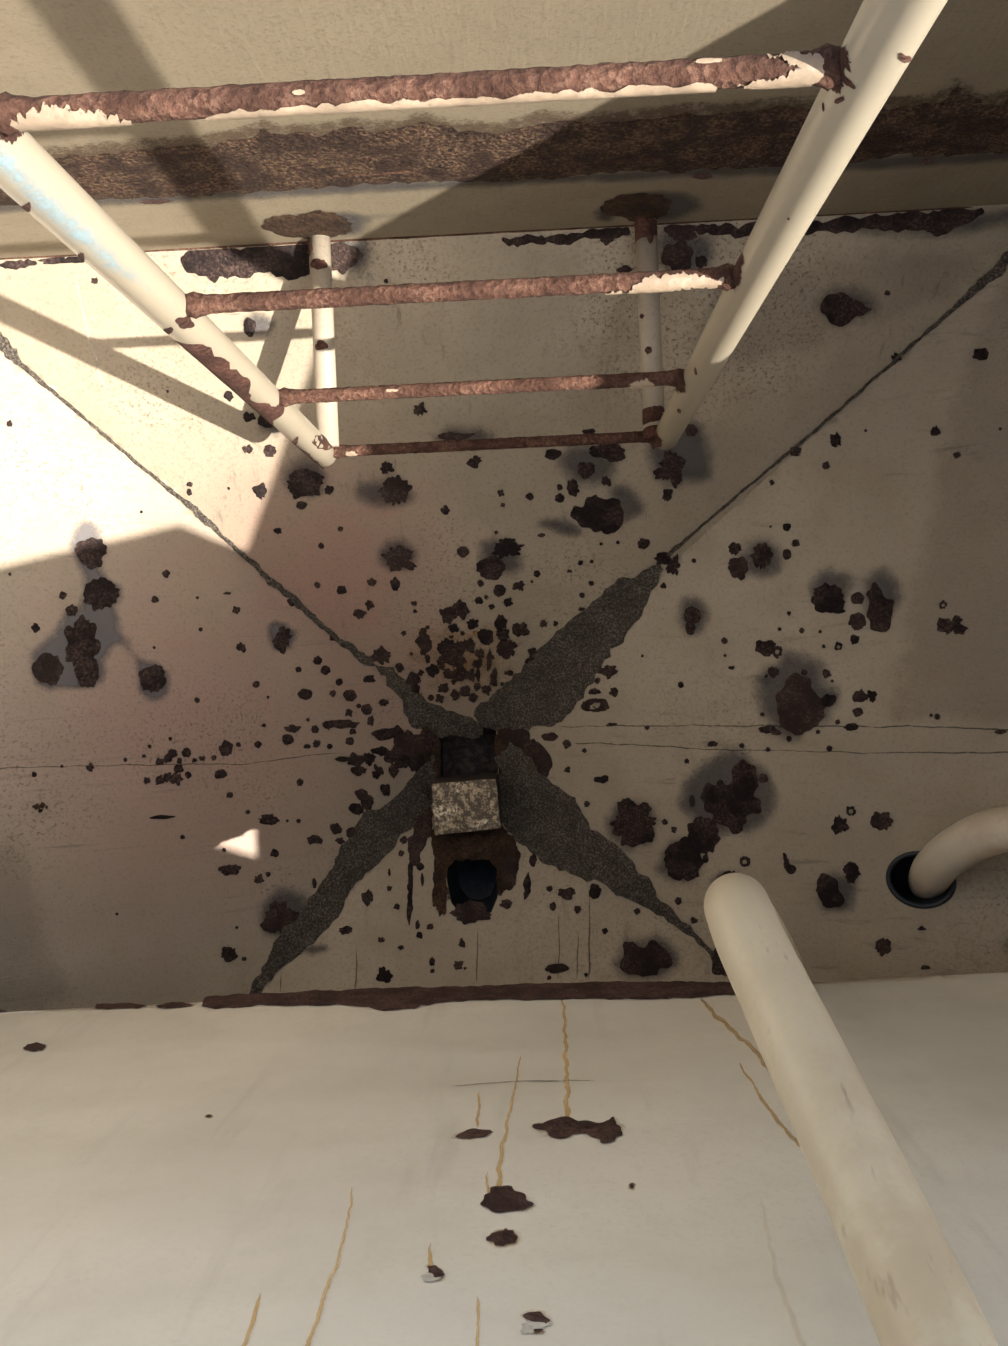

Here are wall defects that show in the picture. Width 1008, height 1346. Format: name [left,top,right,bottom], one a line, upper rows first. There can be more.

rust [47,97,814,200]
rust [849,83,1008,163]
rust [181,210,367,283]
crack [0,753,333,769]
rust [282,428,640,844]
peeling [249,565,715,994]
rust [609,741,773,881]
crack [562,725,1008,754]
rust [755,611,877,752]
rust [95,803,767,1143]
rust [455,1057,534,1213]
crack [459,1079,592,1087]